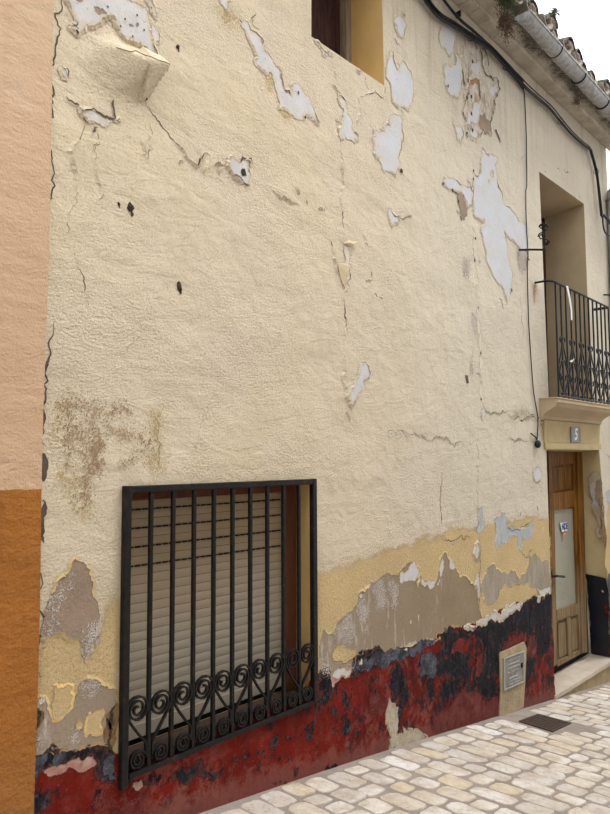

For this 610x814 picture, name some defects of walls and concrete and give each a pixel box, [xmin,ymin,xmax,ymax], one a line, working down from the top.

crack [52,0,63,118]
peeling [64,0,162,56]
crack [139,127,153,159]
crack [172,141,224,175]
peeling [241,14,321,126]
peeling [314,39,342,60]
peeling [372,12,415,177]
flaking render [439,21,501,143]
peeling [443,148,530,304]
crack [41,323,54,543]
peeling [588,471,610,548]
peeling [34,506,553,814]